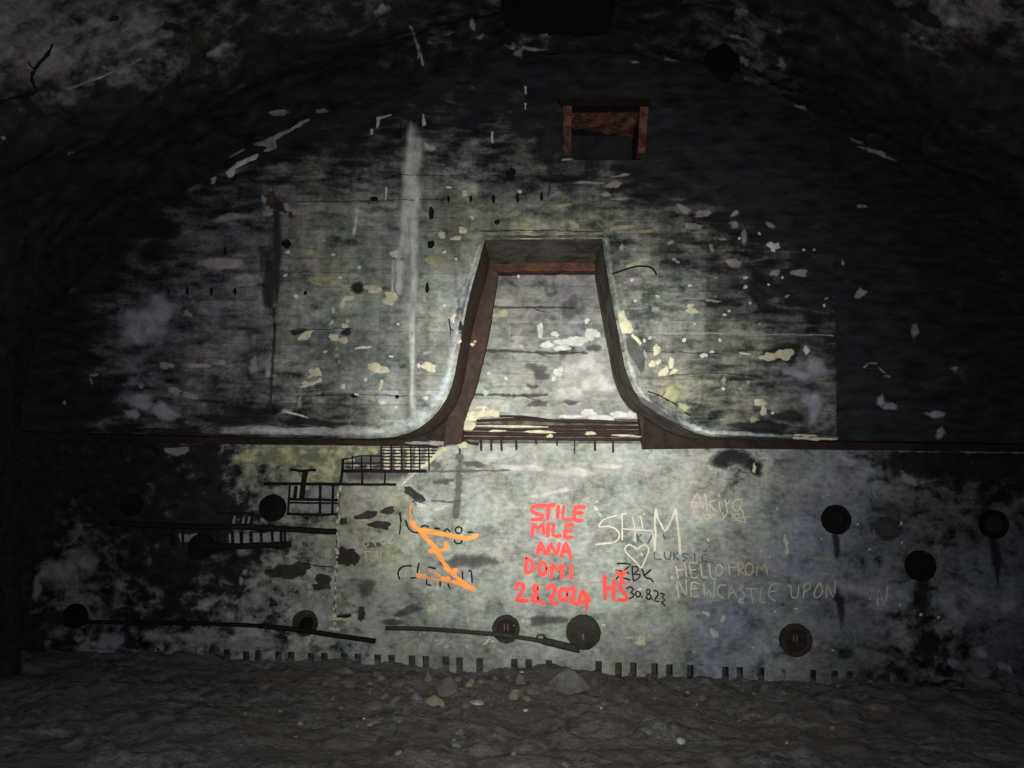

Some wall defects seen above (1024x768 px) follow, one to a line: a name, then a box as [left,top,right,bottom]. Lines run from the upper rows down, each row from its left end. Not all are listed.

crack [0,44,53,105]
peeling [229,109,329,158]
leakage [391,114,436,414]
leakage [261,250,275,351]
peeling [298,314,313,340]
peeling [329,285,407,358]
peeling [683,297,721,314]
peeling [420,351,436,372]
peeling [739,346,810,361]
peeling [368,362,399,405]
peeling [750,399,775,422]